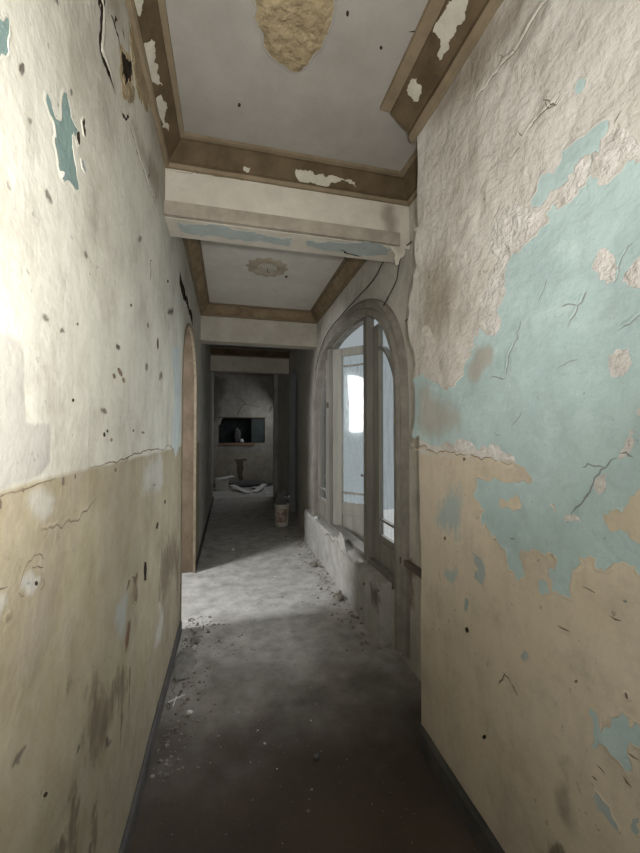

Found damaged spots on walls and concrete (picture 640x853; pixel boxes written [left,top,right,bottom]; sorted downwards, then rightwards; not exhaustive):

peeling [0,10,11,64]
crack [98,0,131,92]
peeling [433,0,468,60]
peeling [43,87,86,194]
crack [121,111,243,215]
peeling [295,169,356,188]
crack [491,319,521,380]
peeling [430,114,640,602]
crack [0,478,56,497]
crack [92,445,173,468]
crack [572,451,633,512]
peeling [585,690,640,779]